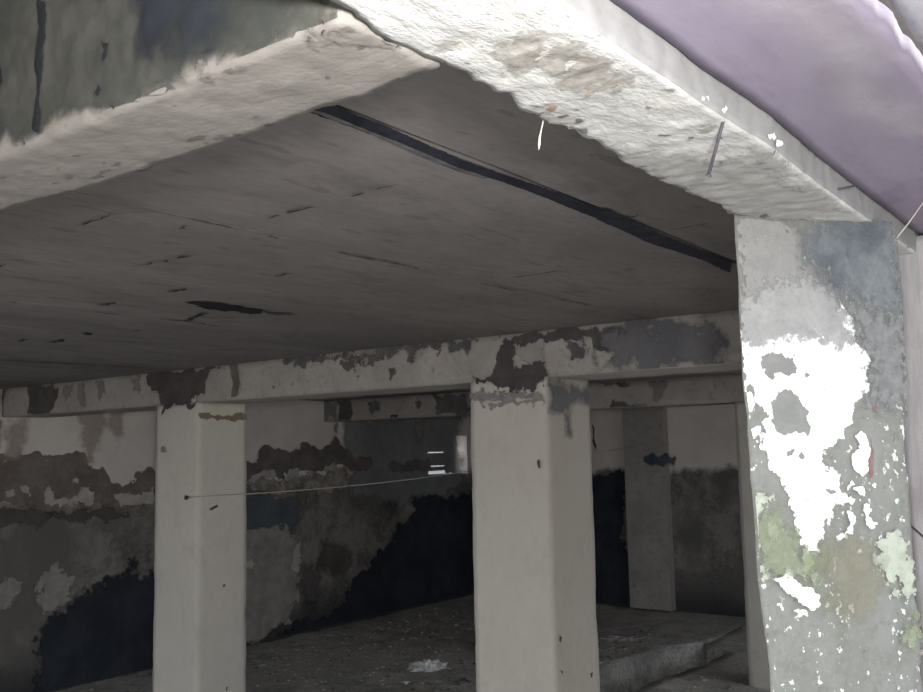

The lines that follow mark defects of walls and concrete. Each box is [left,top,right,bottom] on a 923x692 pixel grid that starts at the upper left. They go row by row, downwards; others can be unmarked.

leakage [0,0,398,142]
peeling [146,366,247,422]
peeling [470,326,626,411]
peeling [736,215,878,551]
peeling [0,450,155,509]
peeling [246,436,373,498]
peeling [0,576,23,611]
peeling [33,559,76,616]
peeling [245,523,303,645]
peeling [760,563,821,616]
peeling [869,514,917,599]